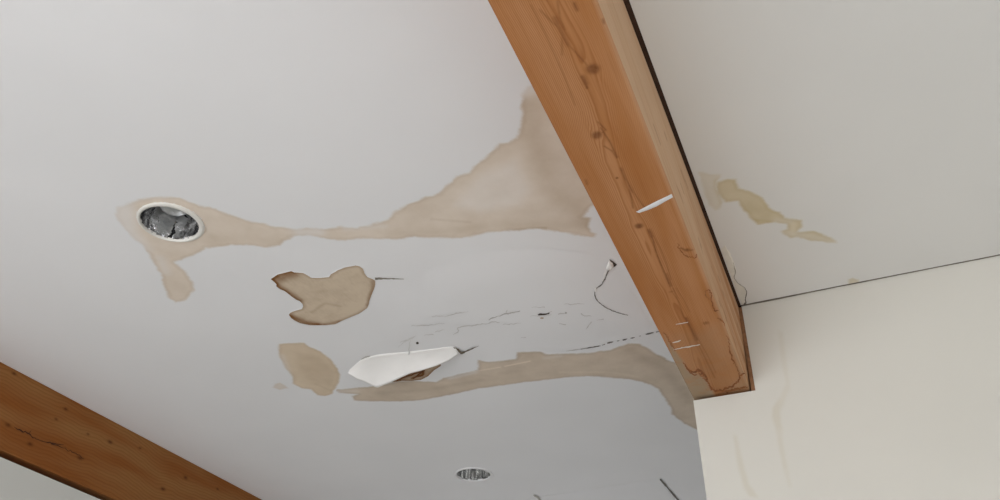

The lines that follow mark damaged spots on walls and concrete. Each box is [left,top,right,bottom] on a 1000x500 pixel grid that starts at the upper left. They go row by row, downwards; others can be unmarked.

damp [105,75,605,307]
damp [692,165,848,249]
peeling [270,265,398,326]
crack [401,260,659,351]
peeling [348,336,478,388]
damp [270,289,748,434]